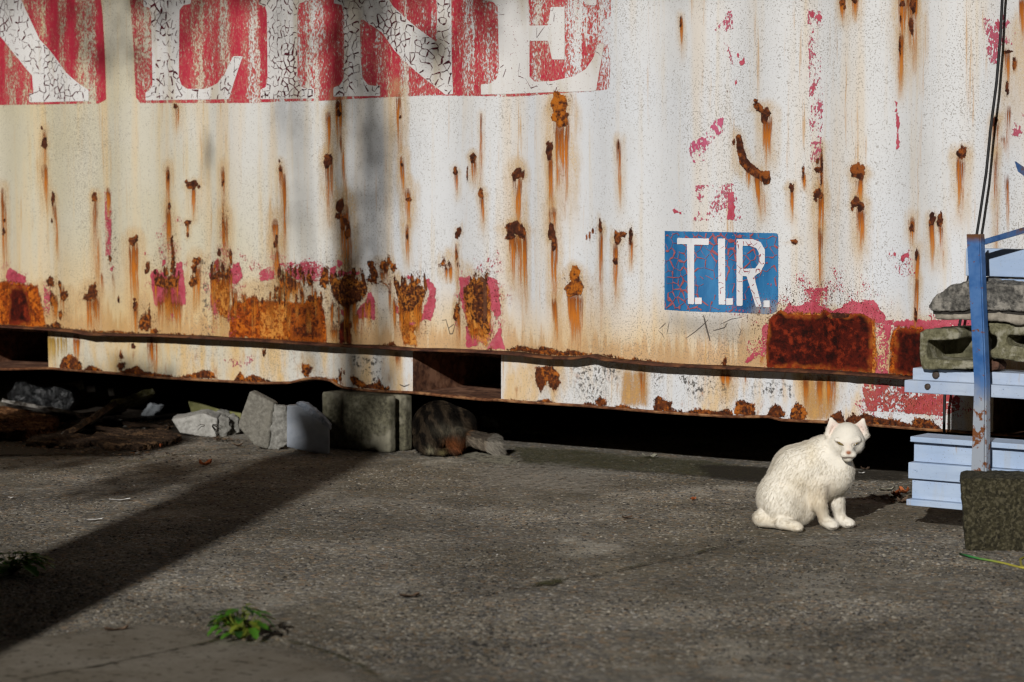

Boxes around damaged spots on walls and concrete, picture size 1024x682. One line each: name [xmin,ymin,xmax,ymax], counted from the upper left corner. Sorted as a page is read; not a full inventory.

crack [0,1,85,101]
crack [144,0,236,99]
crack [259,0,452,99]
corrosion [541,91,571,199]
peeling [689,117,724,163]
corrosion [0,234,217,379]
corrosion [225,98,438,390]
corrosion [548,211,584,337]
corrosion [488,345,755,415]
peeling [693,183,741,222]
crack [665,232,778,313]
peeling [725,267,973,426]